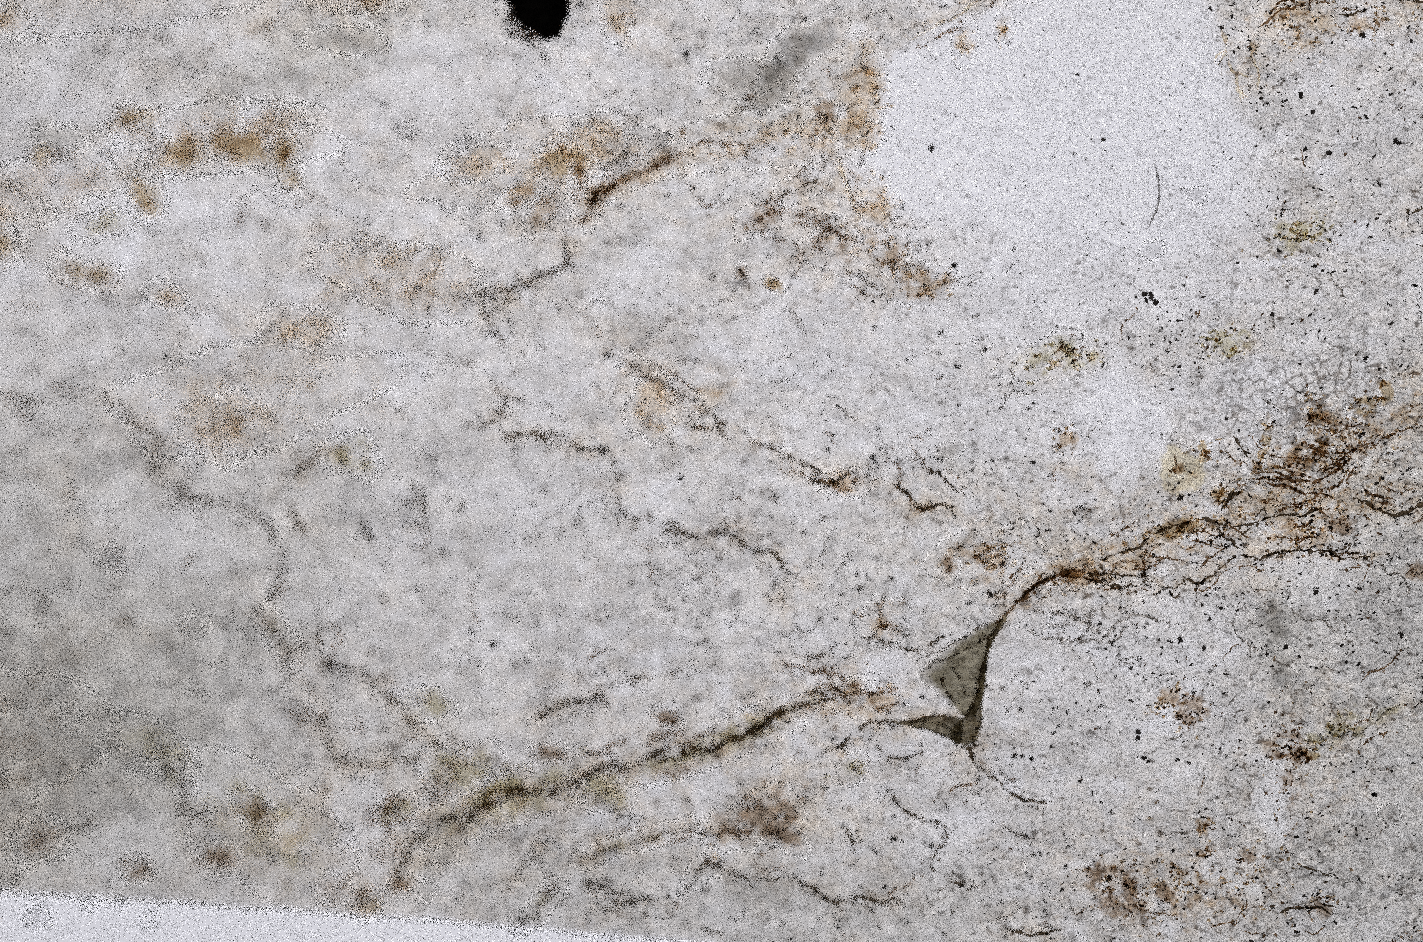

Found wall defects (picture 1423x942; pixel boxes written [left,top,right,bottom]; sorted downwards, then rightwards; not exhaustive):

corrosion [64,100,314,234]
crack [455,93,773,352]
crack [752,150,881,302]
corrosion [733,176,958,311]
crack [600,351,978,517]
corrosion [937,539,1028,587]
corrosion [1014,337,1104,385]
crack [987,402,1423,655]
corrosion [1195,322,1245,359]
corrosion [1025,375,1423,592]
crack [106,387,1062,942]
crack [1277,864,1341,916]